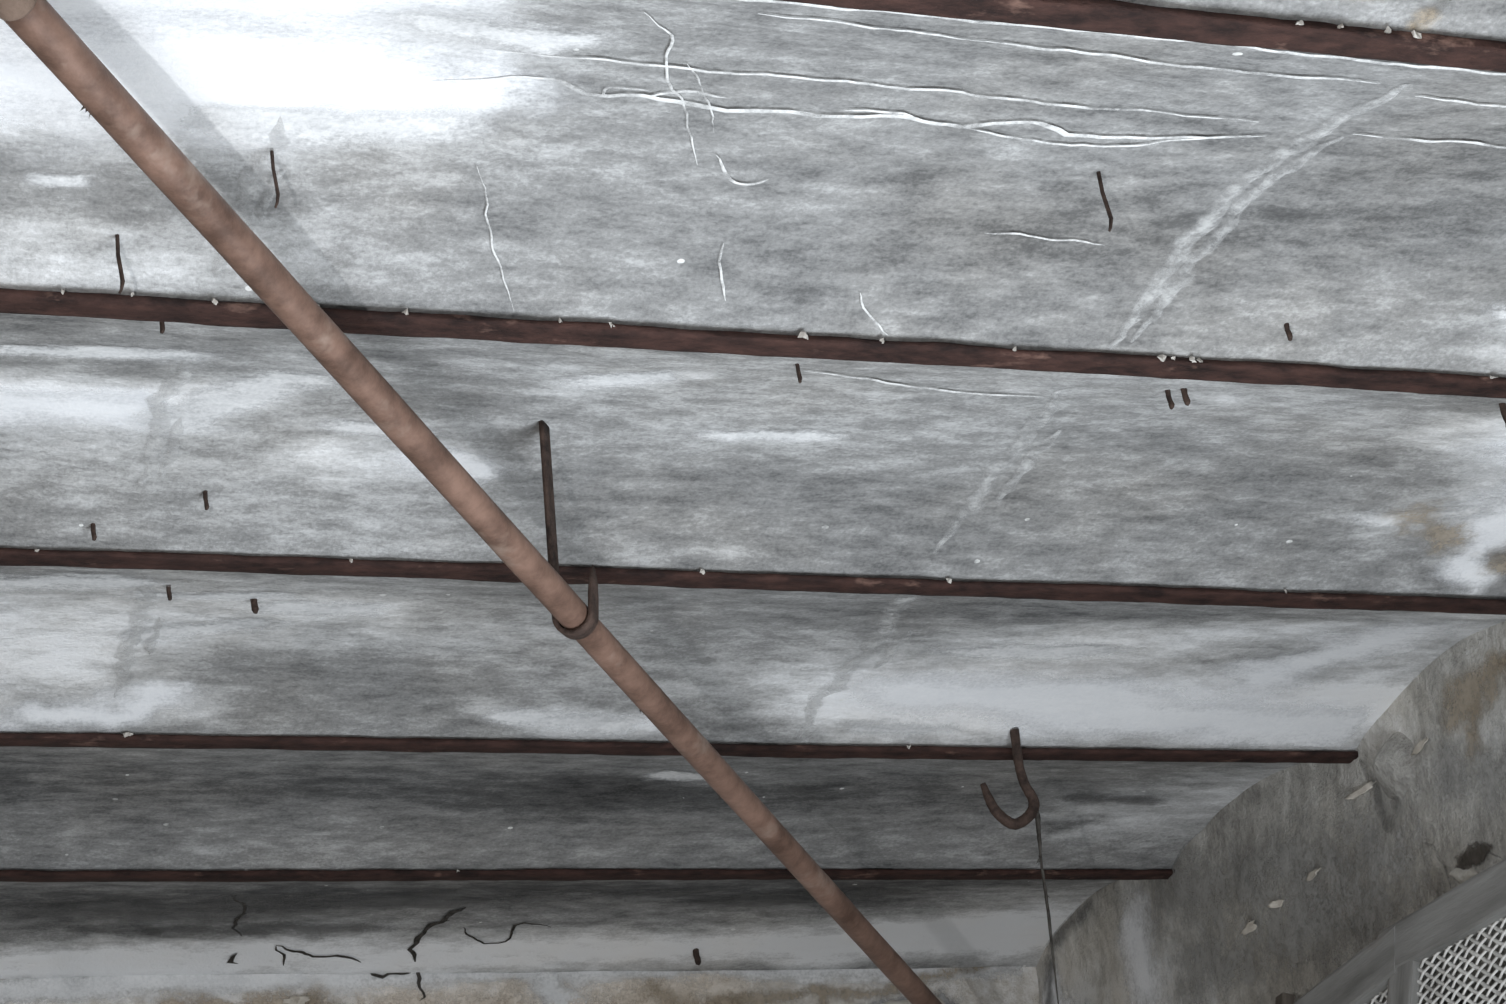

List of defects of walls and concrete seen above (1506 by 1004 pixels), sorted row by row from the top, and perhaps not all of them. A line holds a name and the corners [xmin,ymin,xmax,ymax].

crack [762,14,1376,84]
crack [434,12,1259,186]
crack [1355,96,1506,148]
crack [995,233,1101,245]
leakage [0,345,210,361]
leakage [131,371,332,435]
leakage [699,430,840,442]
leakage [0,573,294,601]
leakage [649,771,705,781]
crack [227,895,550,1001]
flaking render [161,991,318,1004]
flaking render [569,978,747,1004]